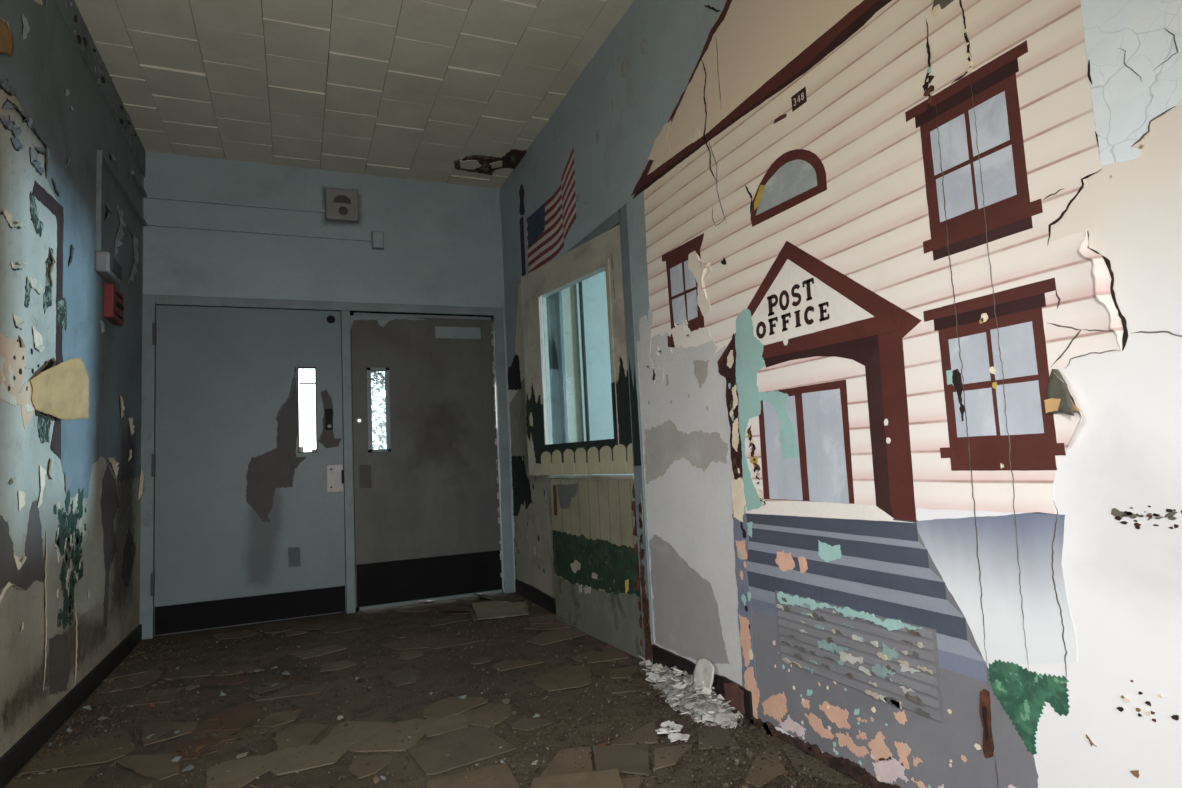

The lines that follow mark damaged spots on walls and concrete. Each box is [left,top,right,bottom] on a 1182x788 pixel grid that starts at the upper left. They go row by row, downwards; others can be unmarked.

crack [1085,61,1093,84]
crack [1131,106,1175,147]
crack [1043,132,1100,242]
peeling [0,313,89,429]
peeling [246,367,307,522]
peeling [946,369,965,421]
crack [922,0,1031,695]
crack [1049,291,1182,369]
peeling [0,458,87,695]
peeling [639,251,944,788]
crack [1051,500,1067,687]
peeling [1117,680,1163,722]